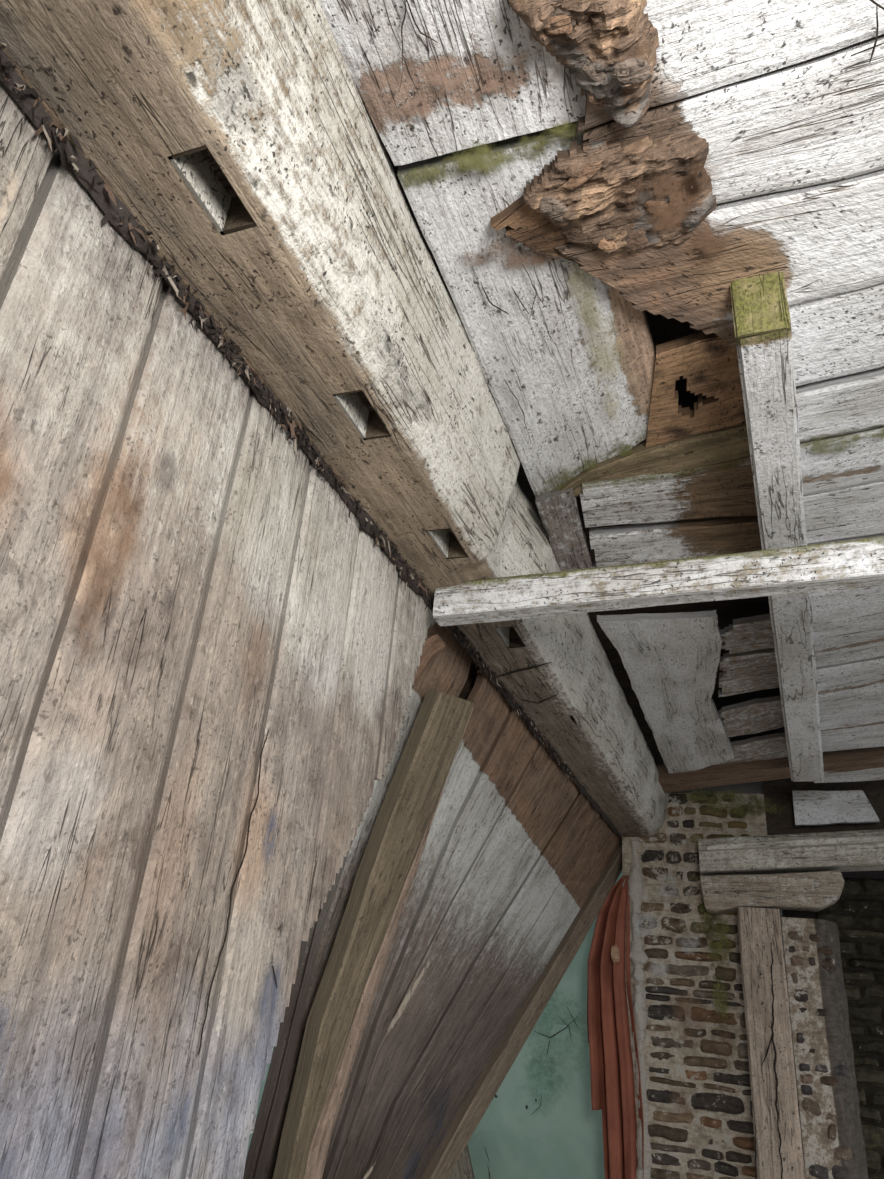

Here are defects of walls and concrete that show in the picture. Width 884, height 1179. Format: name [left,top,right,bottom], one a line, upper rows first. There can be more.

peeling [582,58,654,107]
peeling [539,160,603,222]
peeling [598,239,617,251]